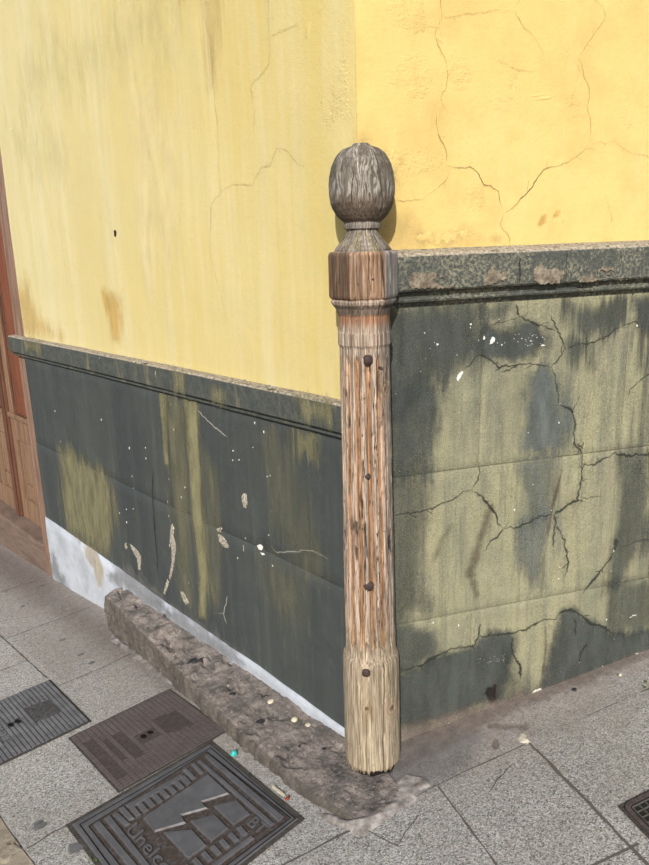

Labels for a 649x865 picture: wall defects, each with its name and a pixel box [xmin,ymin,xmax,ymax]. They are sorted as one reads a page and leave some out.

crack [400,0,573,282]
peeling [408,272,454,290]
peeling [483,266,508,286]
peeling [533,264,565,285]
peeling [579,266,628,283]
water stain [562,294,649,365]
water stain [59,448,118,555]
water stain [390,304,545,727]
crack [398,306,649,573]
crack [405,538,648,684]
water stain [519,367,574,579]
water stain [542,451,649,688]